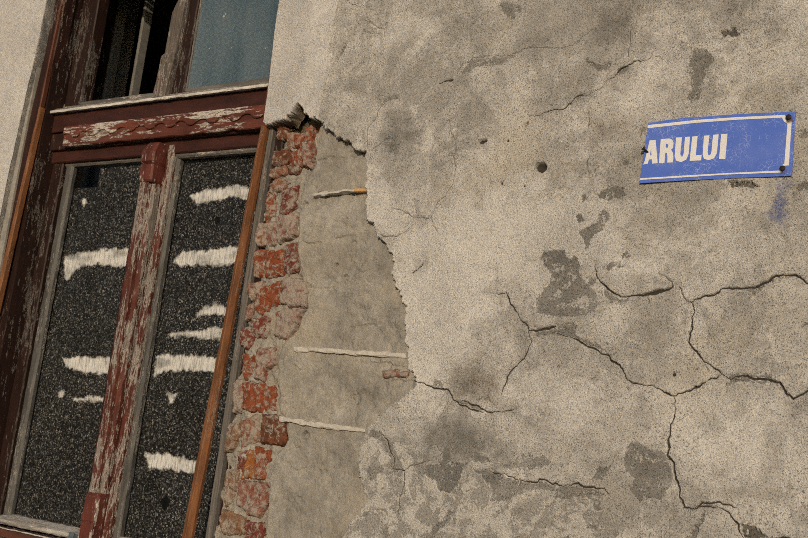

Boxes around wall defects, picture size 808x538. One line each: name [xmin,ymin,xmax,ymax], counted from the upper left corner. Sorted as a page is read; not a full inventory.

crack [530,30,664,128]
peeling [687,49,713,103]
crack [381,107,456,237]
peeling [576,186,625,250]
spalling [215,118,417,538]
peeling [536,250,631,354]
crack [414,263,808,537]
crack [379,431,426,516]